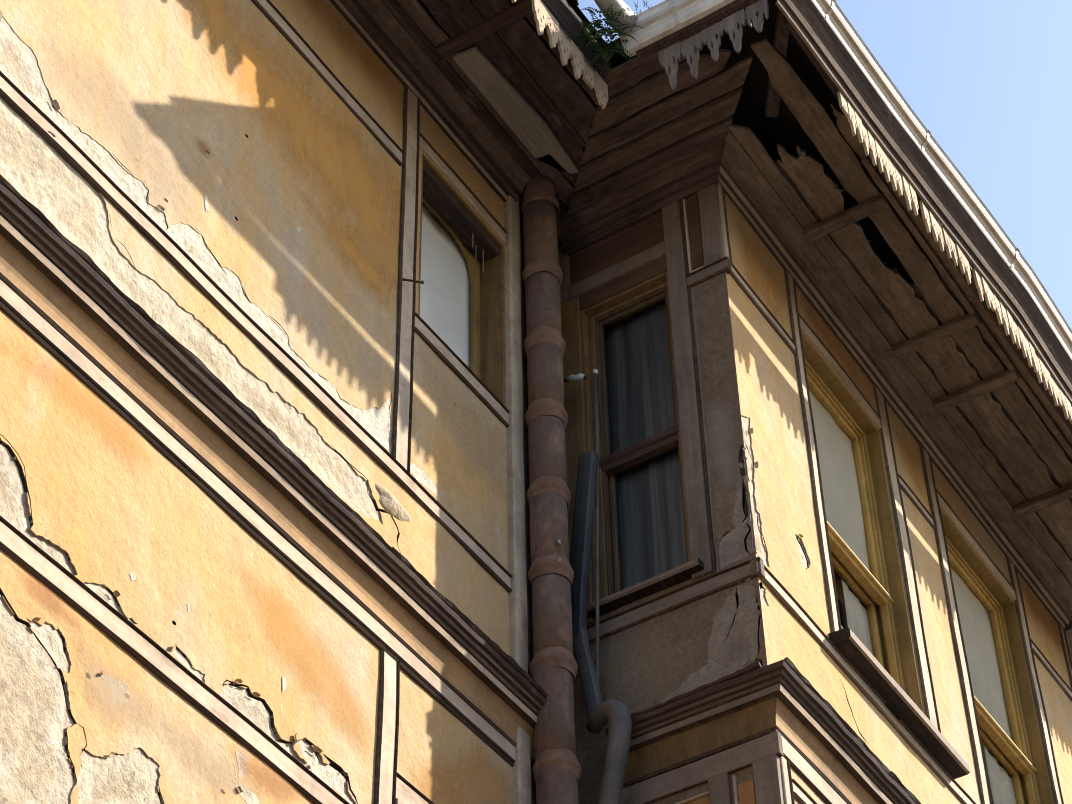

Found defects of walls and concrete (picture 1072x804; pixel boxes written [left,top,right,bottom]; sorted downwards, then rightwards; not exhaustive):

spalling [0,17,392,523]
spalling [0,444,135,624]
crack [741,455,751,555]
spalling [0,595,163,804]
spalling [171,644,204,682]
spalling [220,678,354,804]
peeling [661,578,768,703]